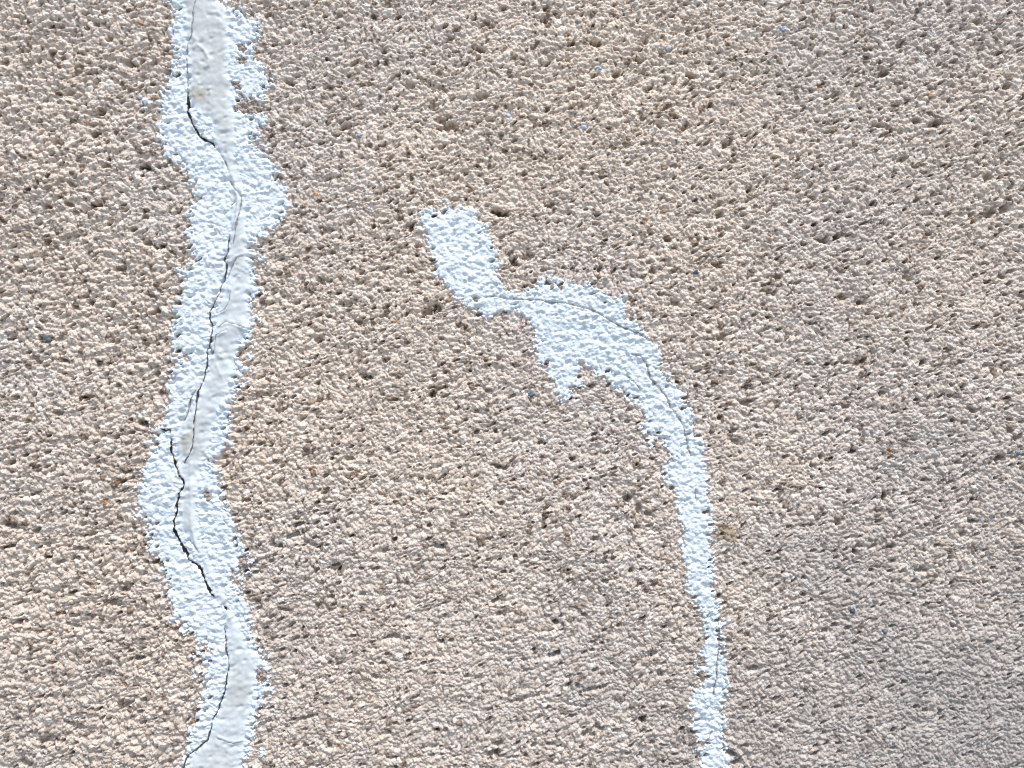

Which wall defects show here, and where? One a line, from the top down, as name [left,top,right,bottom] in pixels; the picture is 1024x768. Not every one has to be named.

crack [159,0,245,768]